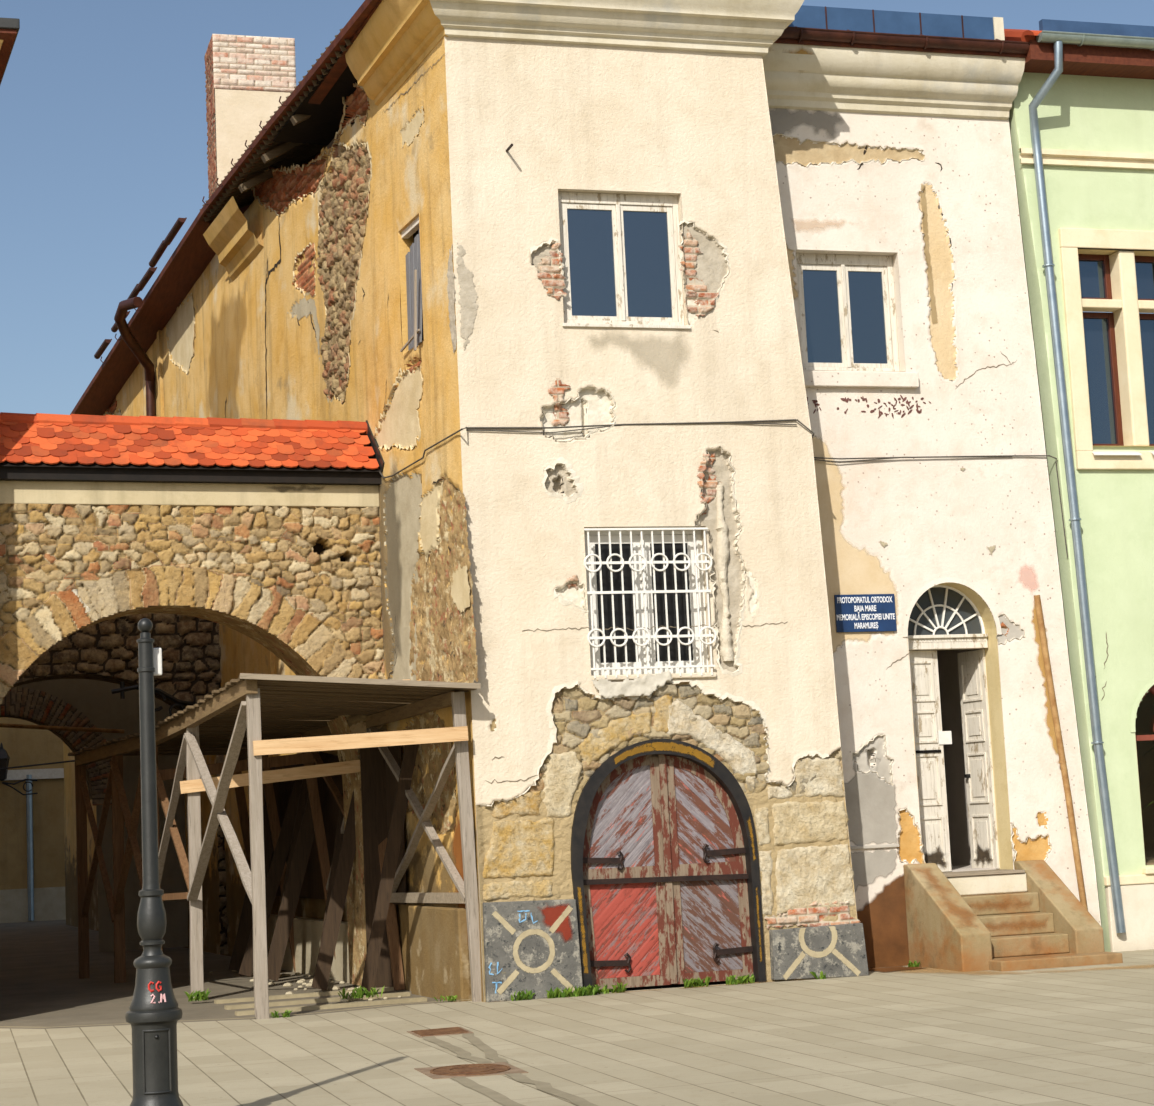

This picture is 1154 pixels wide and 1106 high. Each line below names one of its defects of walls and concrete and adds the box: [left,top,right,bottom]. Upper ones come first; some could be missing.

spalling [251,82,370,217]
peeling [772,134,925,167]
crack [265,217,281,419]
spalling [530,237,567,300]
spalling [678,220,730,327]
peeling [918,183,958,380]
spalling [540,378,616,442]
peeling [409,474,478,683]
peeling [401,742,457,834]
flaking render [476,670,894,1002]
peeling [897,807,946,866]
peeling [1011,812,1052,862]